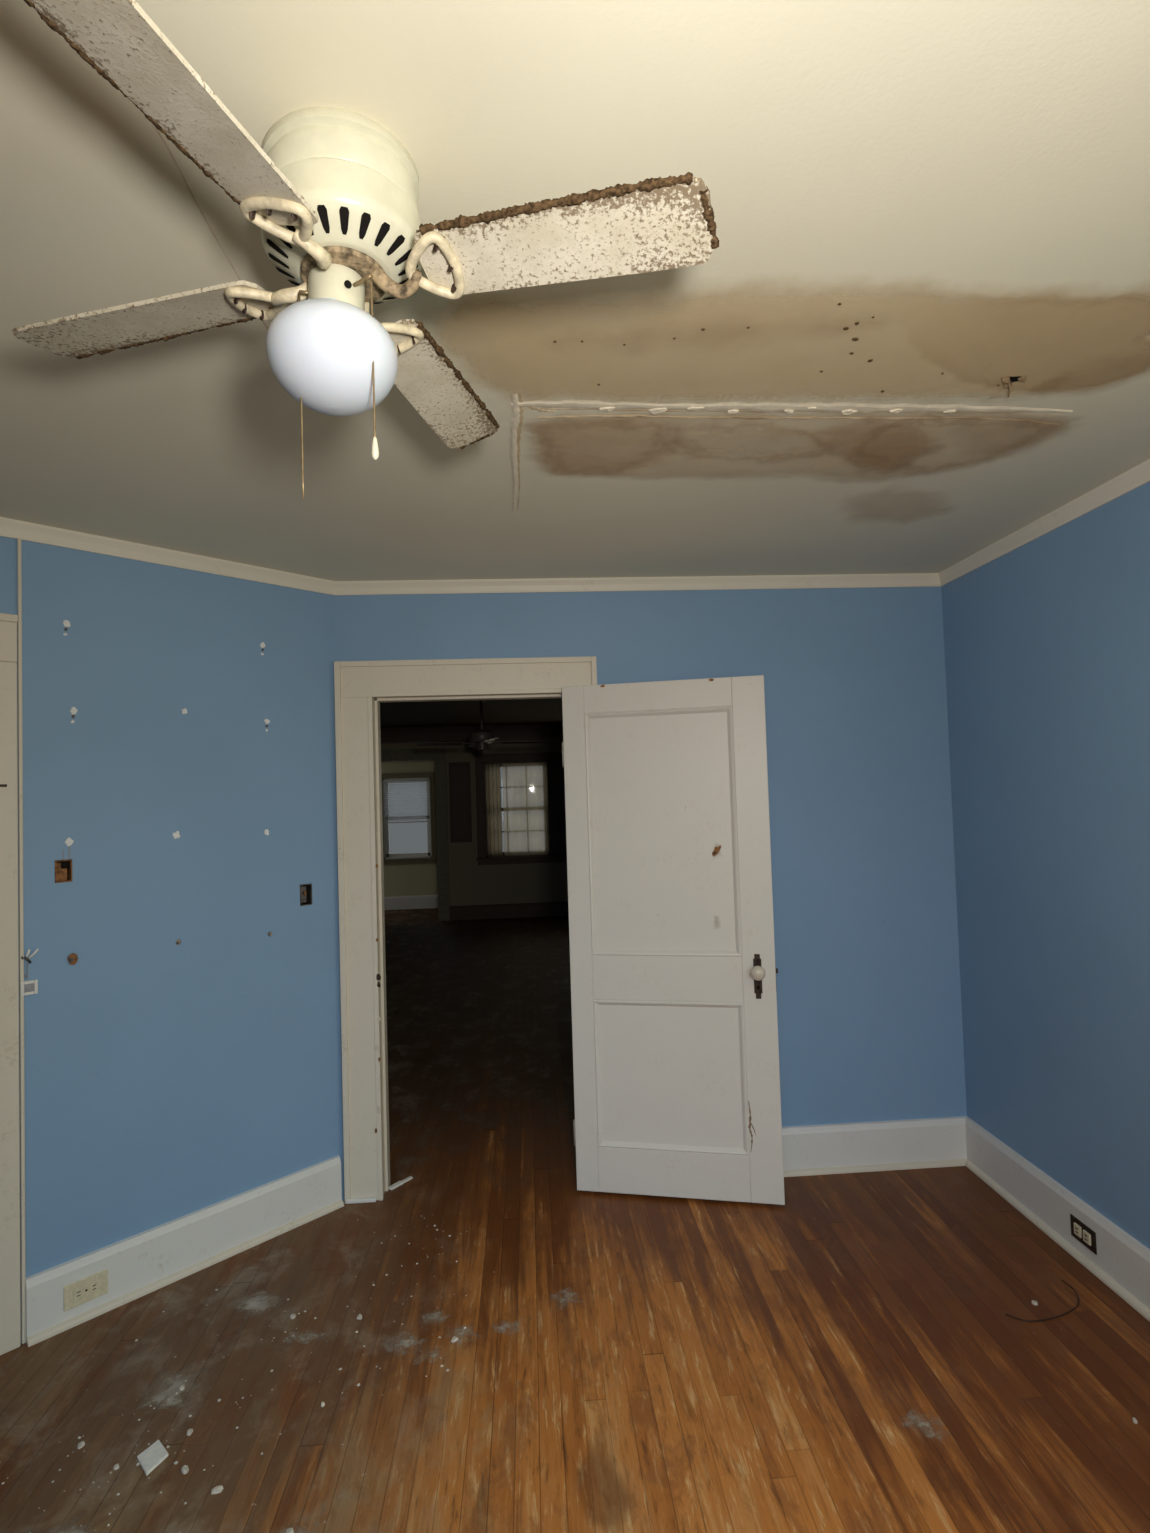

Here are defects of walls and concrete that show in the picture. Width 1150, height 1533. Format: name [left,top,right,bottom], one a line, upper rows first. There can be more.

damp [415,298,1150,450]